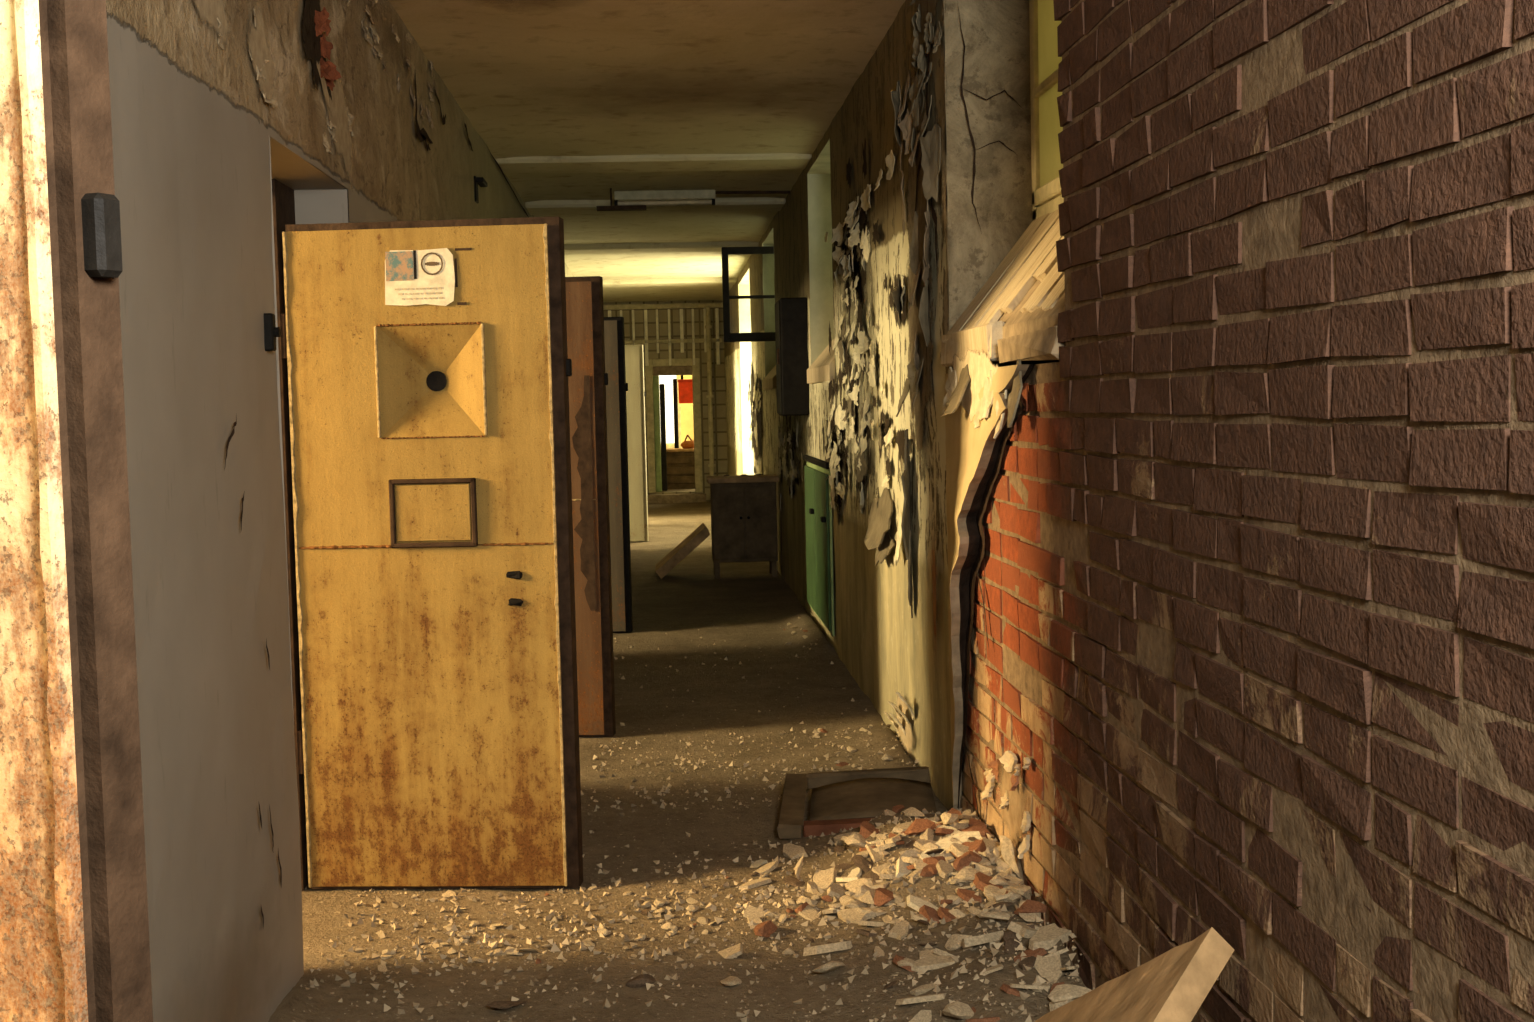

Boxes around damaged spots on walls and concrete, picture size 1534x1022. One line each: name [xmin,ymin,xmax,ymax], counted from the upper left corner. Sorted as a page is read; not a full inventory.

flaking render [302,0,355,189]
crack [915,1,1022,374]
flaking render [822,0,1023,618]
peeling [748,360,804,509]
spalling [981,751,1031,859]